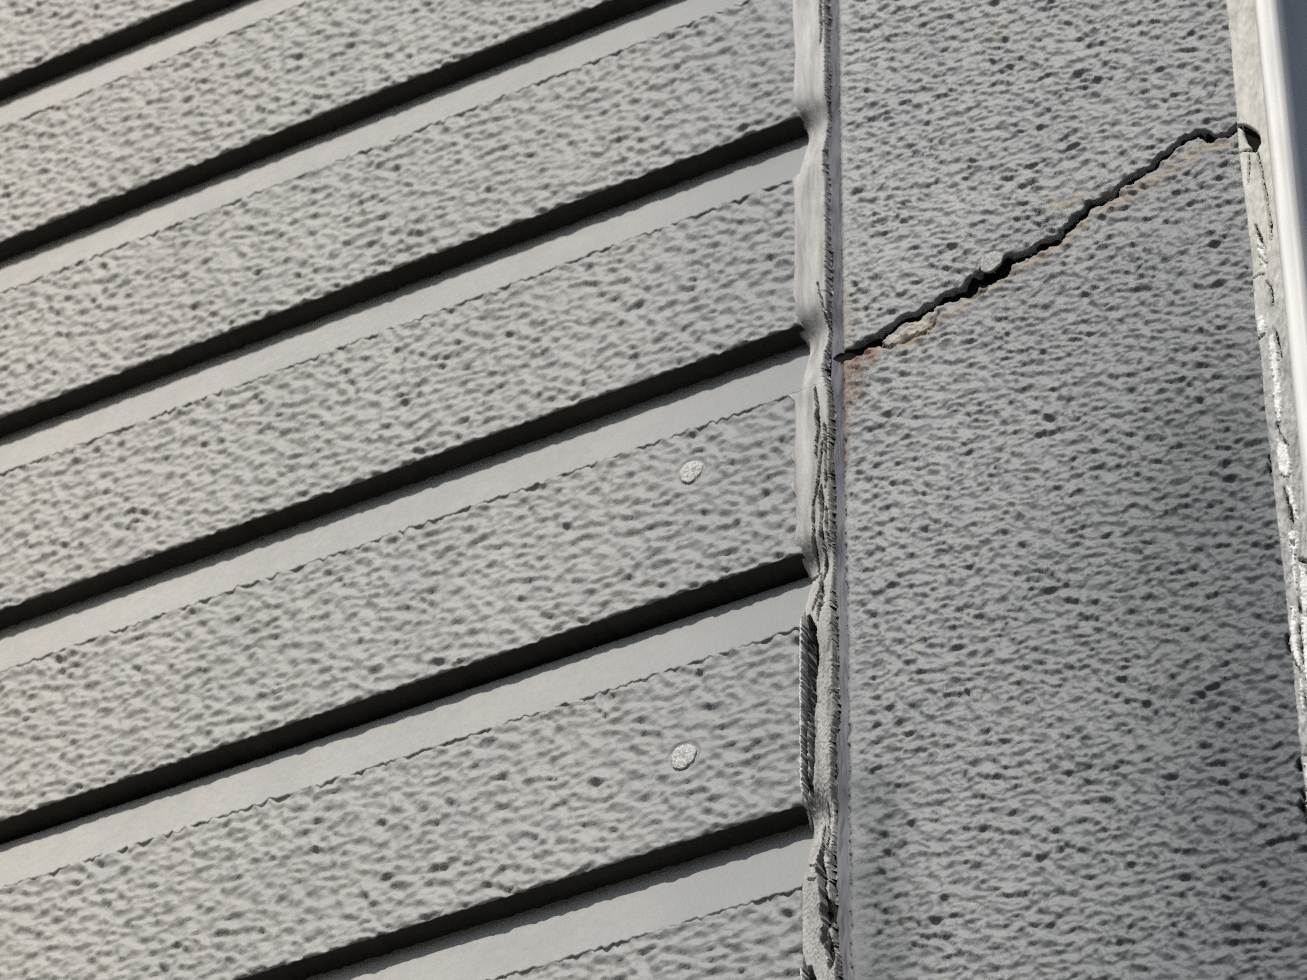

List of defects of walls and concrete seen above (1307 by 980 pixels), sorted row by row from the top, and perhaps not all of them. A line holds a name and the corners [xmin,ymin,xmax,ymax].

crack [822,126,1283,365]
crack [815,496,831,605]
crack [811,850,837,968]